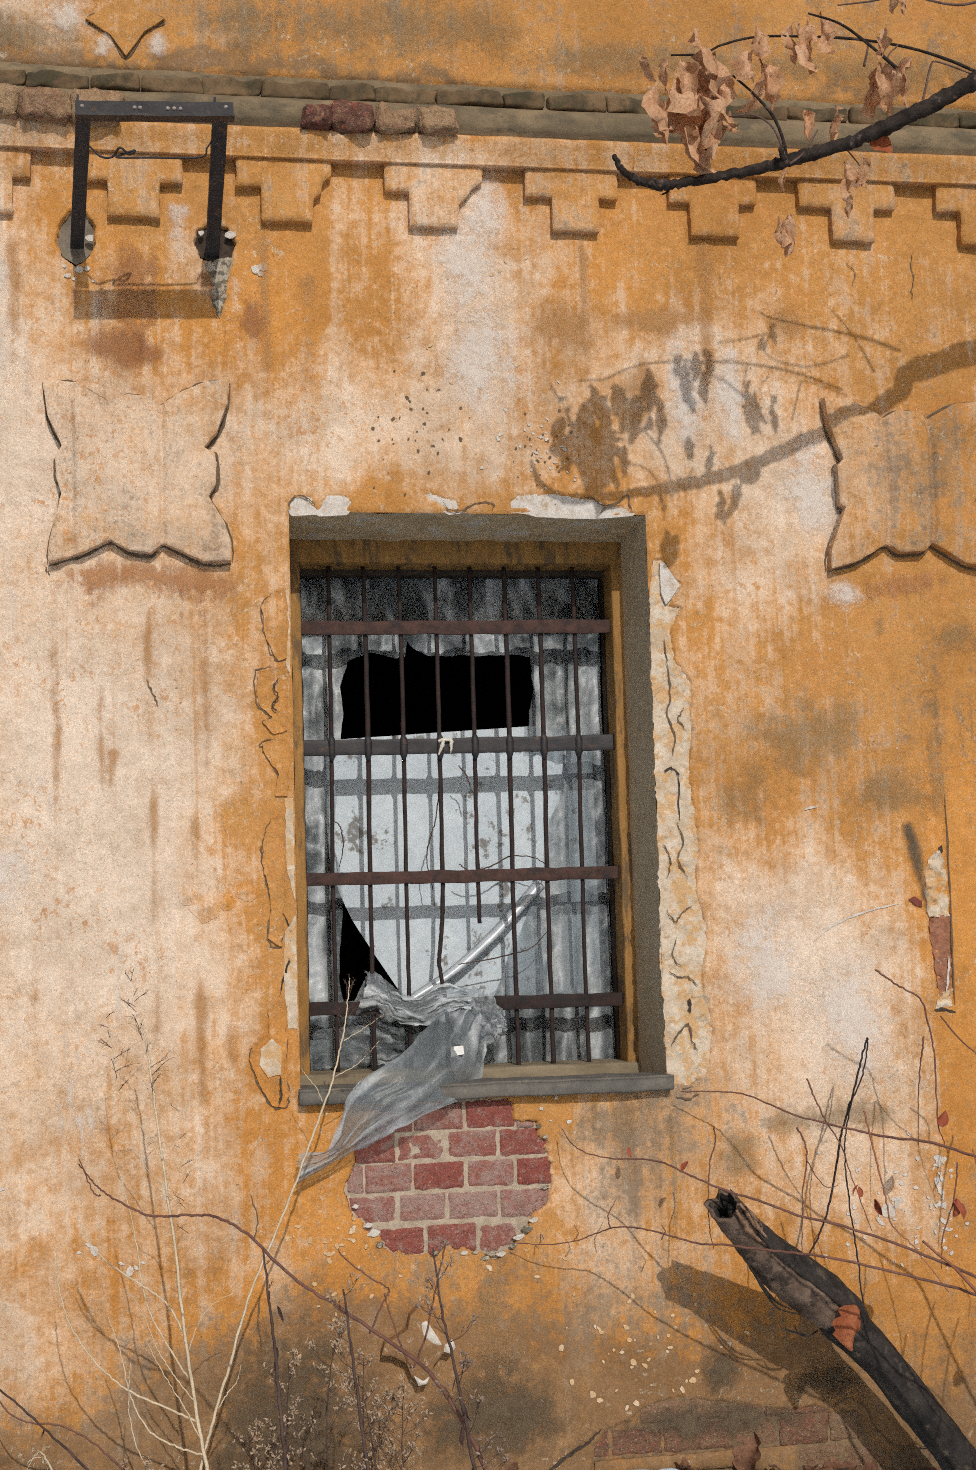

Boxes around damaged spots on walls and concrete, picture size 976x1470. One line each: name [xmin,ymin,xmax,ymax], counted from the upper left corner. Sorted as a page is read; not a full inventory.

spalling [57,214,95,283]
spalling [195,228,236,318]
spalling [251,263,268,276]
peeling [288,495,351,517]
spalling [371,371,462,474]
peeling [425,408,635,519]
peeling [249,588,298,1110]
spalling [648,560,712,1085]
spalling [293,1095,576,1299]
damp [214,1342,362,1470]
damp [424,1366,558,1453]